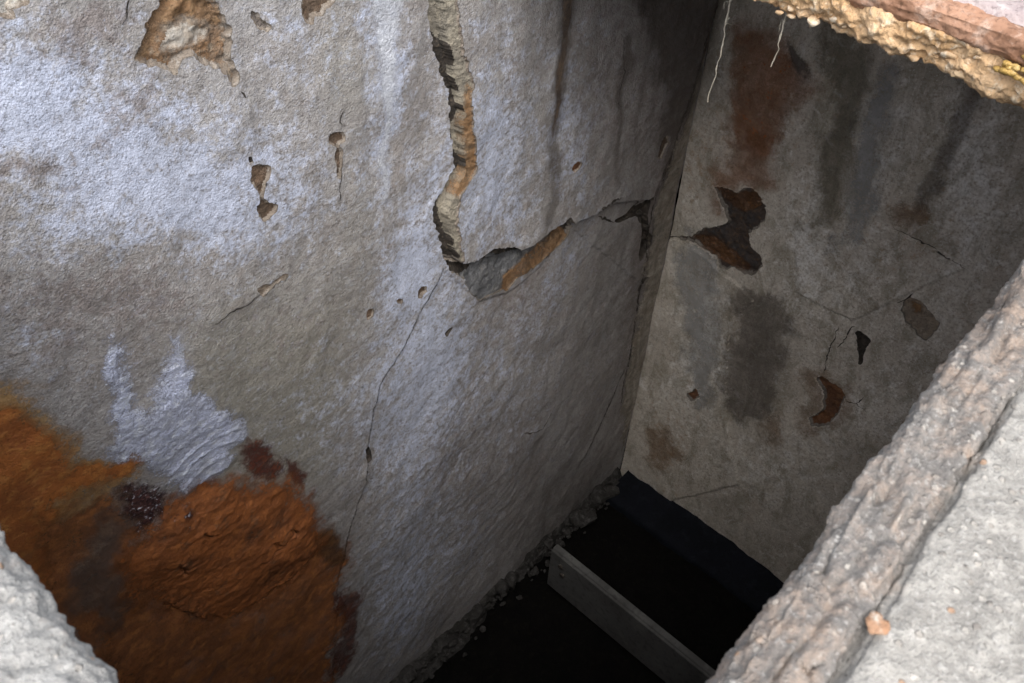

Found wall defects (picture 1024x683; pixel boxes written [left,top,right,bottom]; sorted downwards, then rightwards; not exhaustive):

spalling [134,0,240,87]
rust [733,30,810,151]
peeling [248,157,278,222]
peeling [329,131,346,179]
peeling [678,186,766,276]
crack [344,0,478,556]
spalling [855,331,871,365]
peeling [901,297,940,341]
damp [102,333,248,494]
peeling [809,376,846,427]
rust [0,385,363,683]